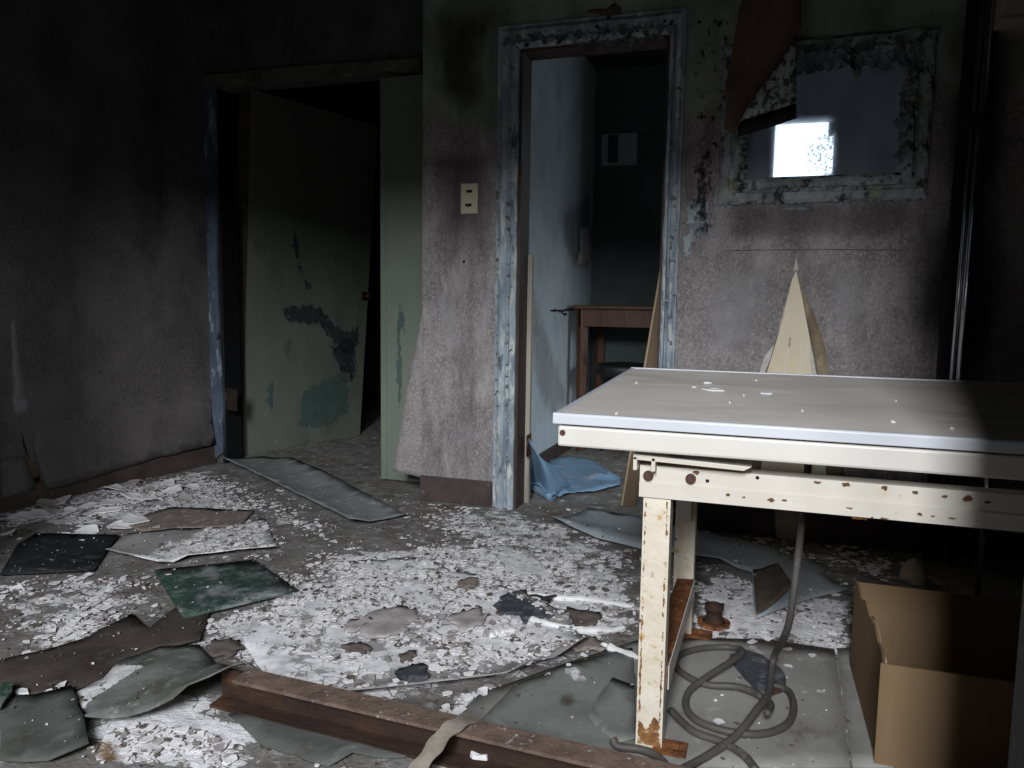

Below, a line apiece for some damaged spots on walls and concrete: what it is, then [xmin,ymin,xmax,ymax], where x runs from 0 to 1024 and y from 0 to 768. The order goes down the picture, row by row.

peeling [283,304,359,381]
peeling [493,3,675,477]
damp [683,19,729,267]
peeling [737,47,925,194]